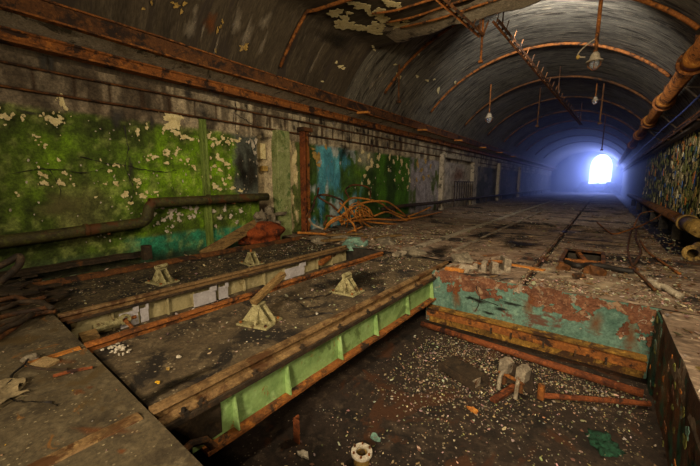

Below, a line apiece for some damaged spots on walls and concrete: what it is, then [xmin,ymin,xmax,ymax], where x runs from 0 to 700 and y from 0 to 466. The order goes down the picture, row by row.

spalling [326,0,498,35]
peeling [0,107,26,126]
peeling [39,93,72,136]
peeling [27,157,75,187]
crack [12,126,174,202]
peeling [94,158,159,215]
peeling [138,108,258,194]
peeling [153,205,200,233]
spalling [426,269,700,466]